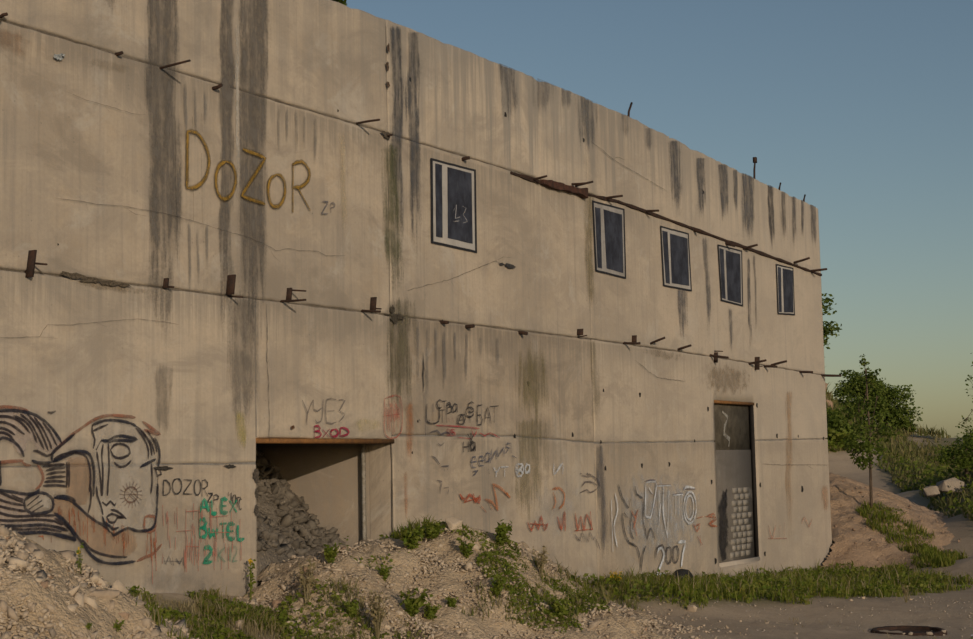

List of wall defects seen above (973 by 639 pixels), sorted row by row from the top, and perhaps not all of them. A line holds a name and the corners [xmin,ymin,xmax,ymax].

damp [146,0,181,286]
crack [58,198,345,260]
damp [219,0,268,317]
damp [391,27,420,222]
damp [670,141,680,202]
damp [697,158,706,207]
damp [719,164,754,229]
damp [768,185,816,240]